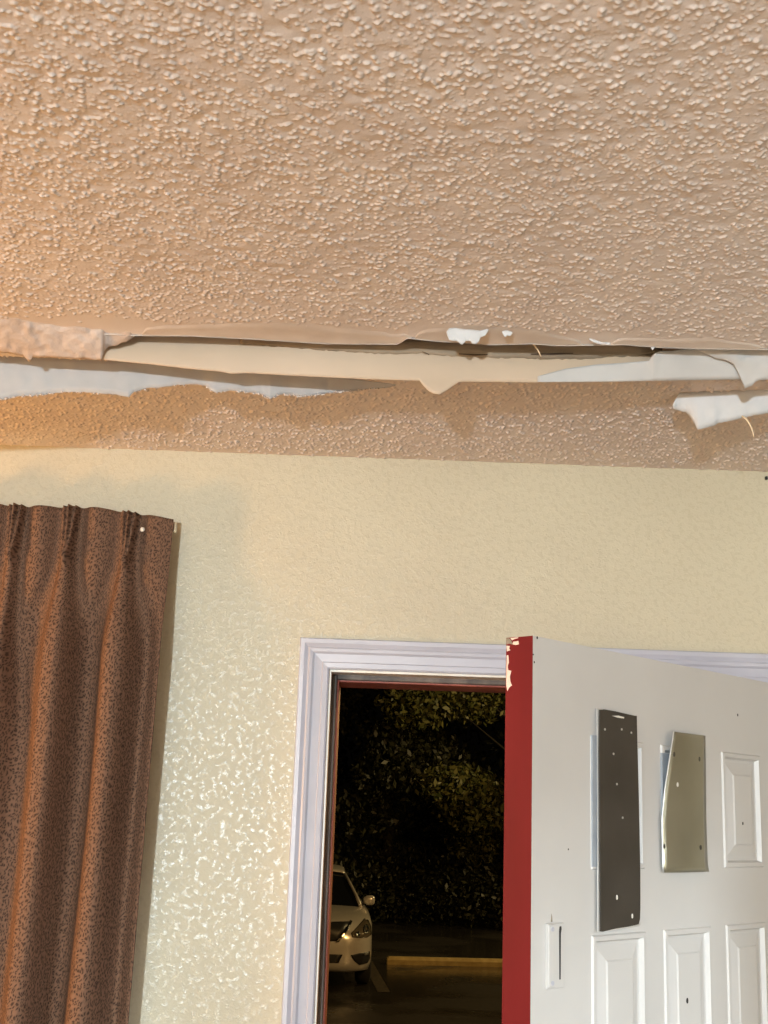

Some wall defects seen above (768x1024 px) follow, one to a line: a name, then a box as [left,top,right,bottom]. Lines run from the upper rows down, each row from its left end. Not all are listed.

peeling [142,323,764,350]
crack [193,336,768,357]